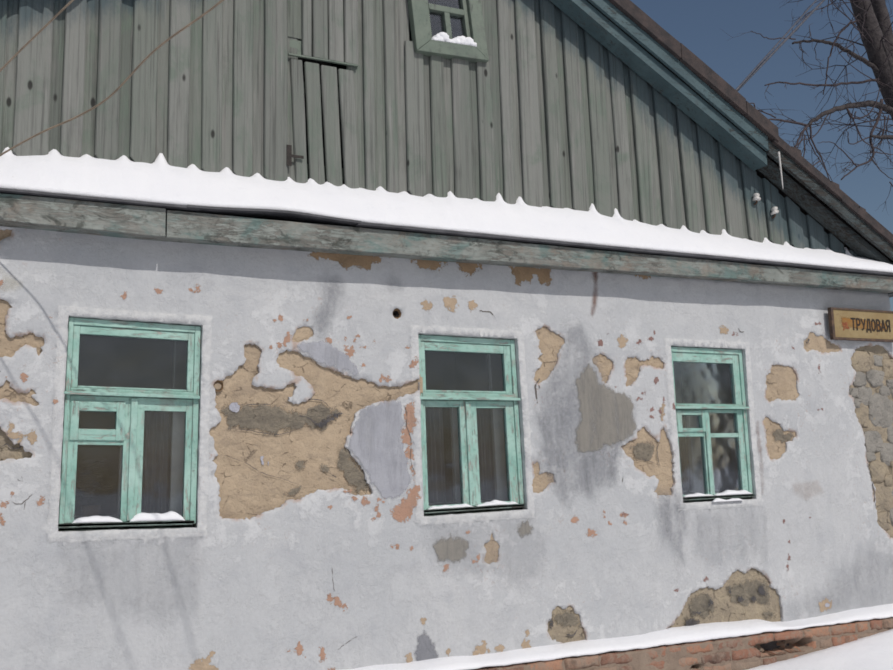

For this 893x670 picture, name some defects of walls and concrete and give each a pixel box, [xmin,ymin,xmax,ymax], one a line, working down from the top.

flaking render [0,373,39,406]
flaking render [0,299,44,357]
flaking render [534,326,565,384]
flaking render [766,365,799,402]
flaking render [792,322,840,353]
spalling [0,421,38,461]
flaking render [209,319,423,523]
flaking render [621,396,675,496]
flaking render [763,417,796,460]
flaking render [849,345,893,538]
spalling [547,606,585,643]
spalling [669,568,781,628]